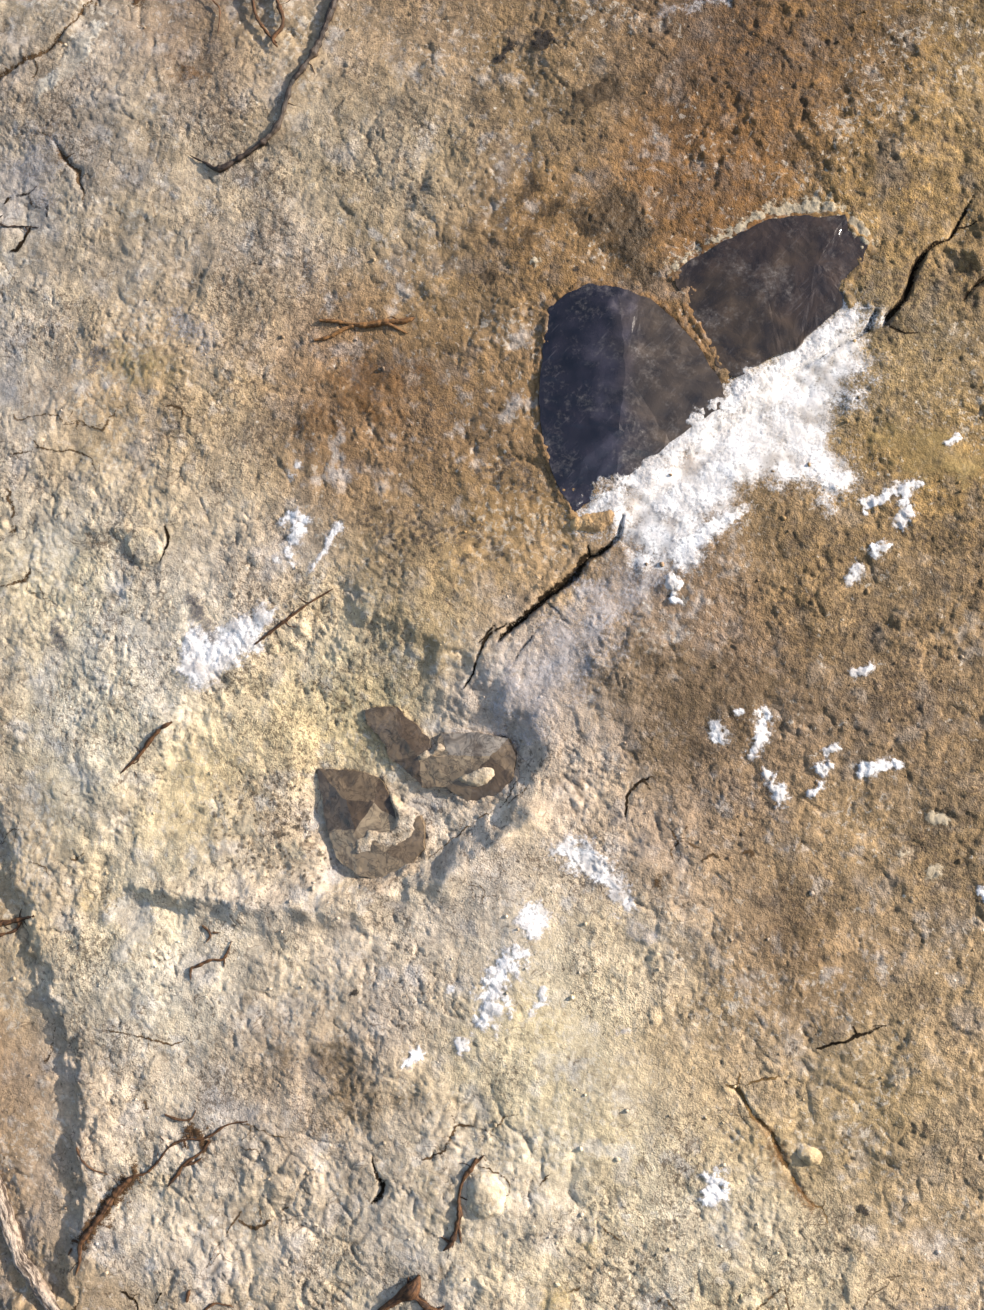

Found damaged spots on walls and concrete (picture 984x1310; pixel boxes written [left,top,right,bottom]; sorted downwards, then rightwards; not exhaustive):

crack [792,195,984,372]
leakage [578,304,924,605]
crack [464,524,624,688]
crack [104,1026,191,1048]